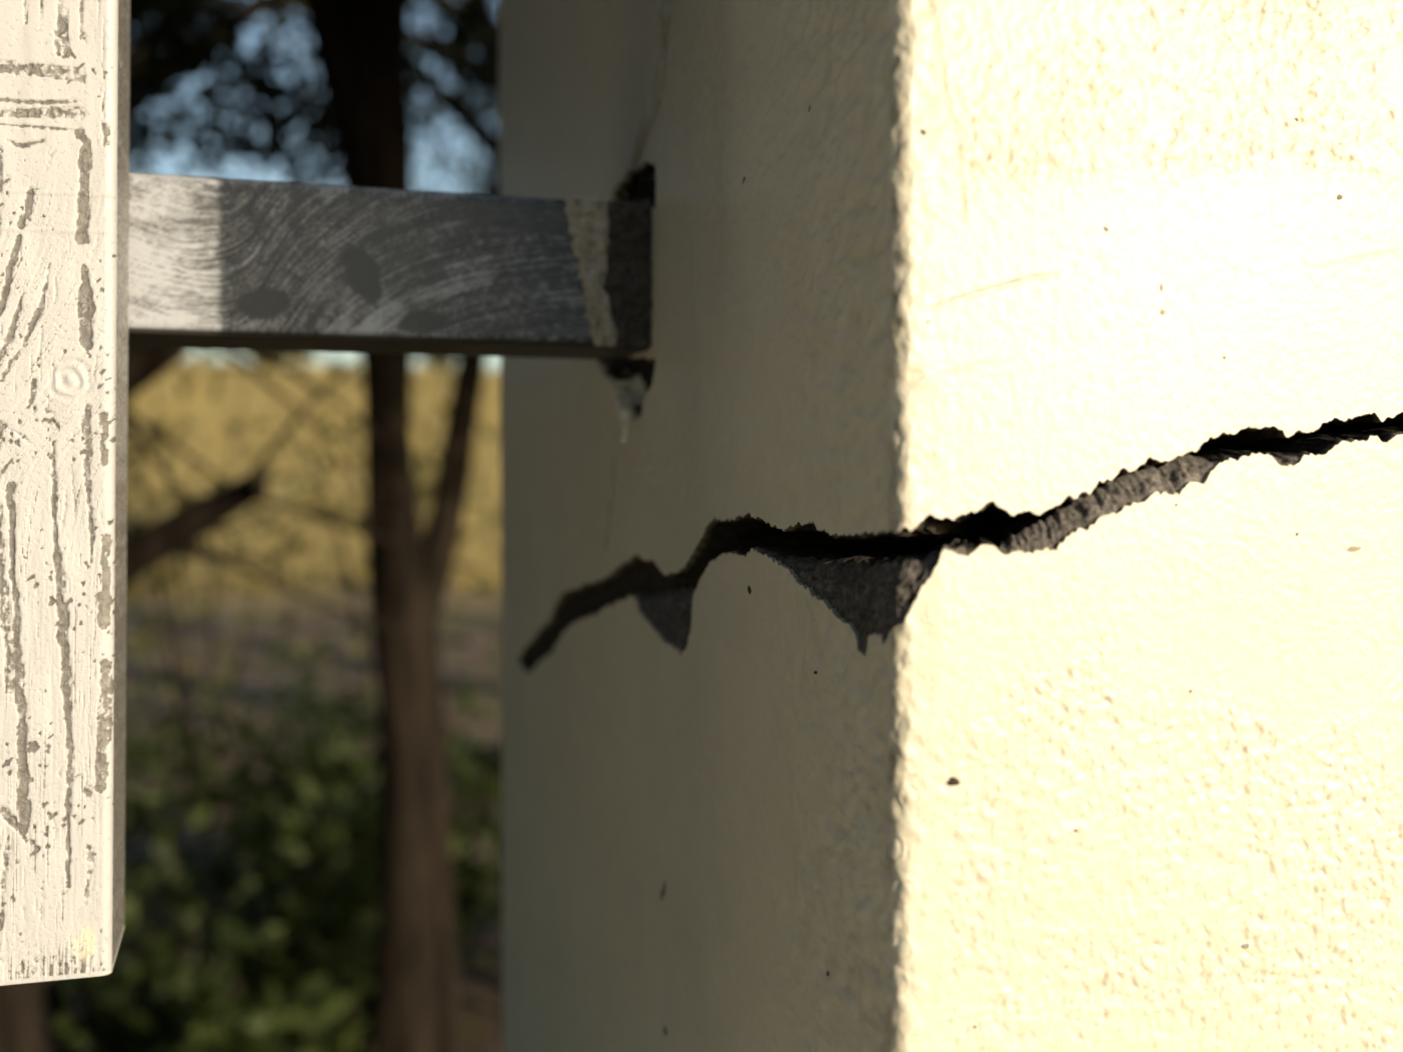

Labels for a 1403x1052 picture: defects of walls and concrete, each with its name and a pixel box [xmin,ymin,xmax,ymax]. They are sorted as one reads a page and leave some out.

crack [519,412,1403,675]